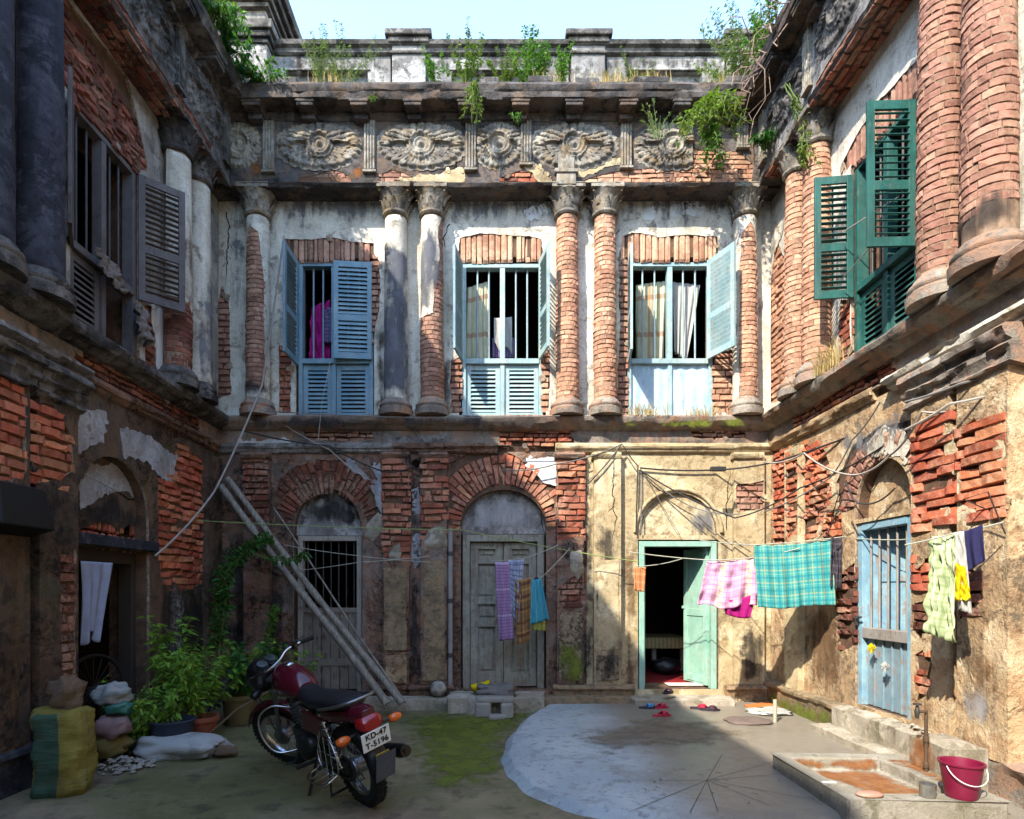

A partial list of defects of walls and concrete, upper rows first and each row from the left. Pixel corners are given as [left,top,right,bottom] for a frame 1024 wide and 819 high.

crack [223,212,233,284]
spalling [218,227,266,398]
damp [378,245,408,403]
spalling [420,215,463,413]
spalling [576,0,1021,415]
spalling [0,377,204,591]
spalling [237,430,586,568]
spalling [736,409,1013,545]